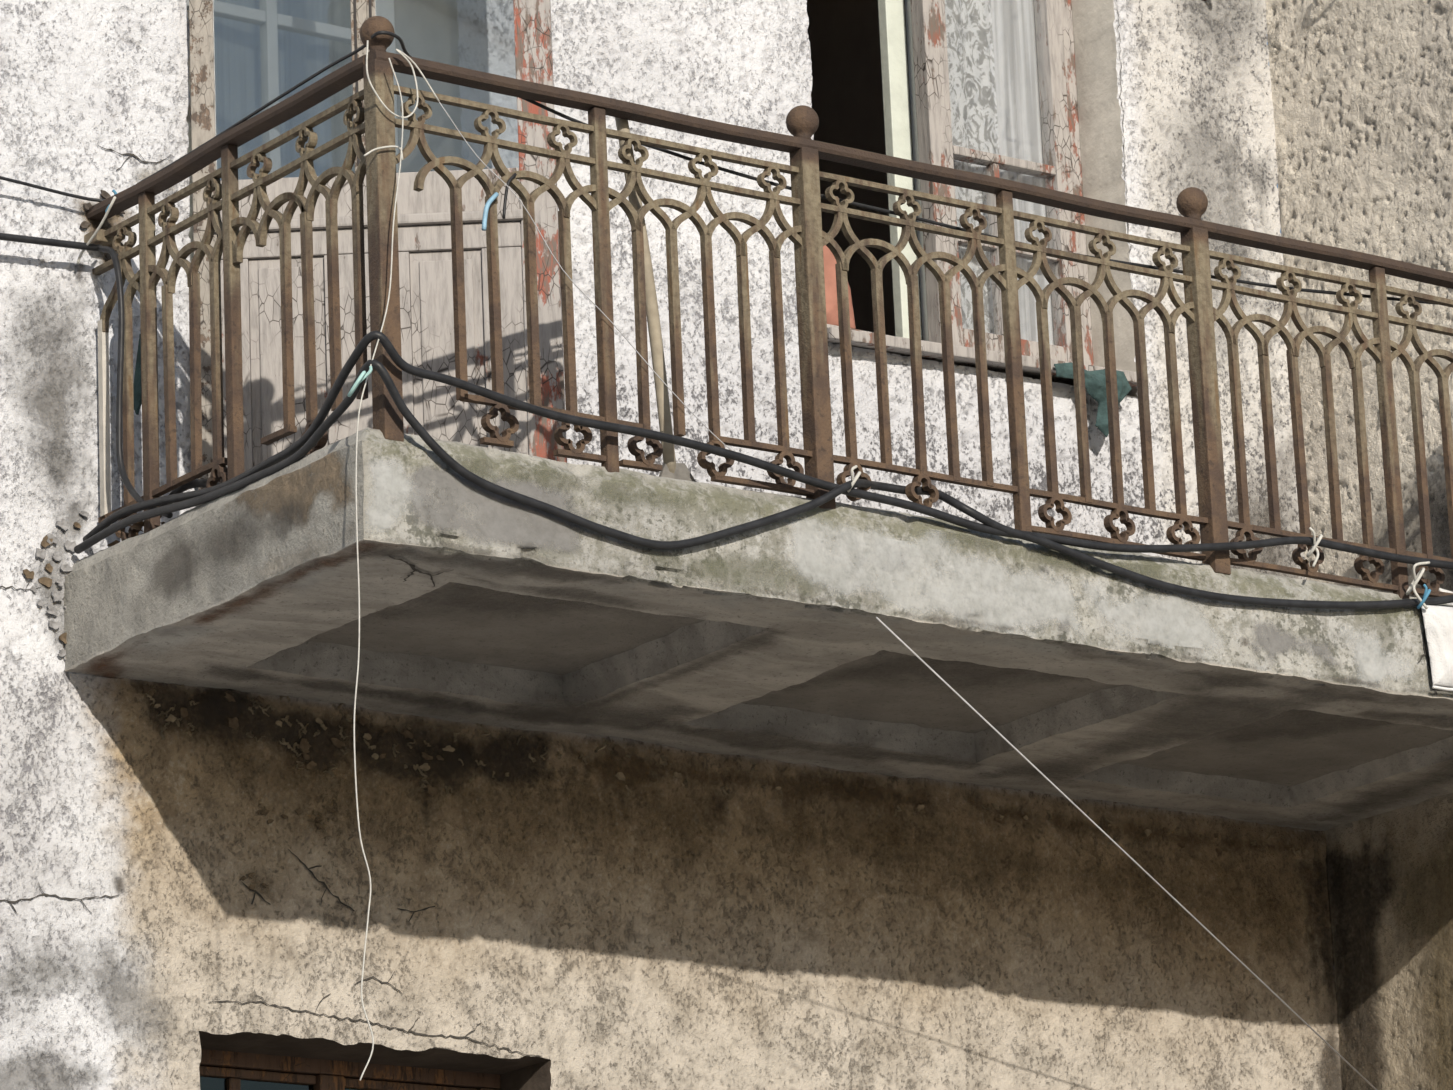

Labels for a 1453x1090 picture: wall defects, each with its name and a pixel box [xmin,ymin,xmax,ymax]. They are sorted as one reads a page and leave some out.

flaking render [23,502,89,661]
damp [796,521,1077,627]
damp [1092,590,1211,648]
crack [0,882,118,915]
crack [242,882,270,905]
crack [288,849,354,911]
crack [397,906,435,921]
damp [1309,845,1392,1090]